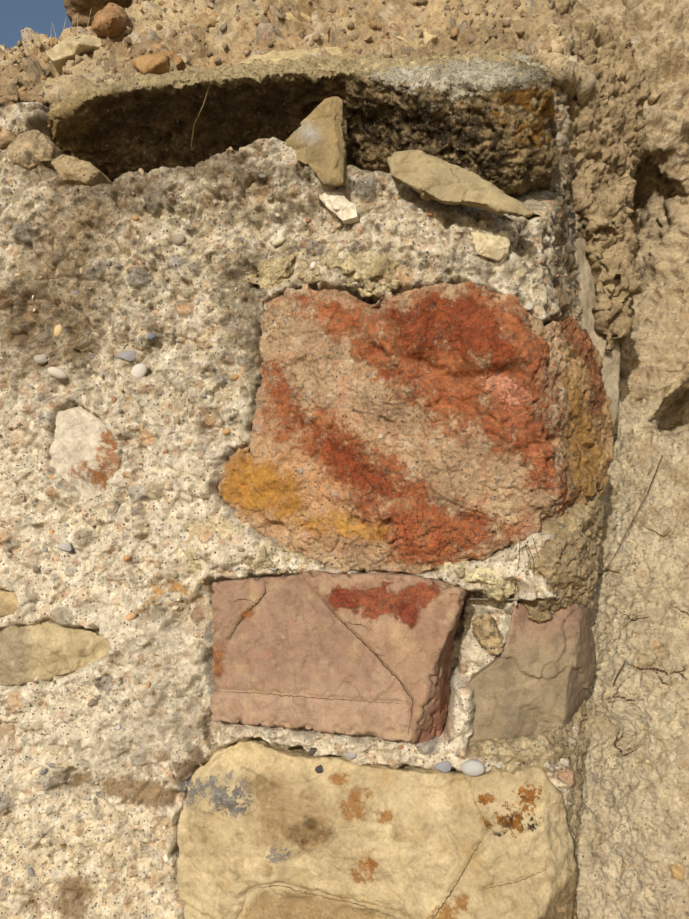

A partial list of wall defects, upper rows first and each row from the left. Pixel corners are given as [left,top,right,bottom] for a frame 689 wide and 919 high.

crack [628,663,687,685]
crack [613,727,637,756]